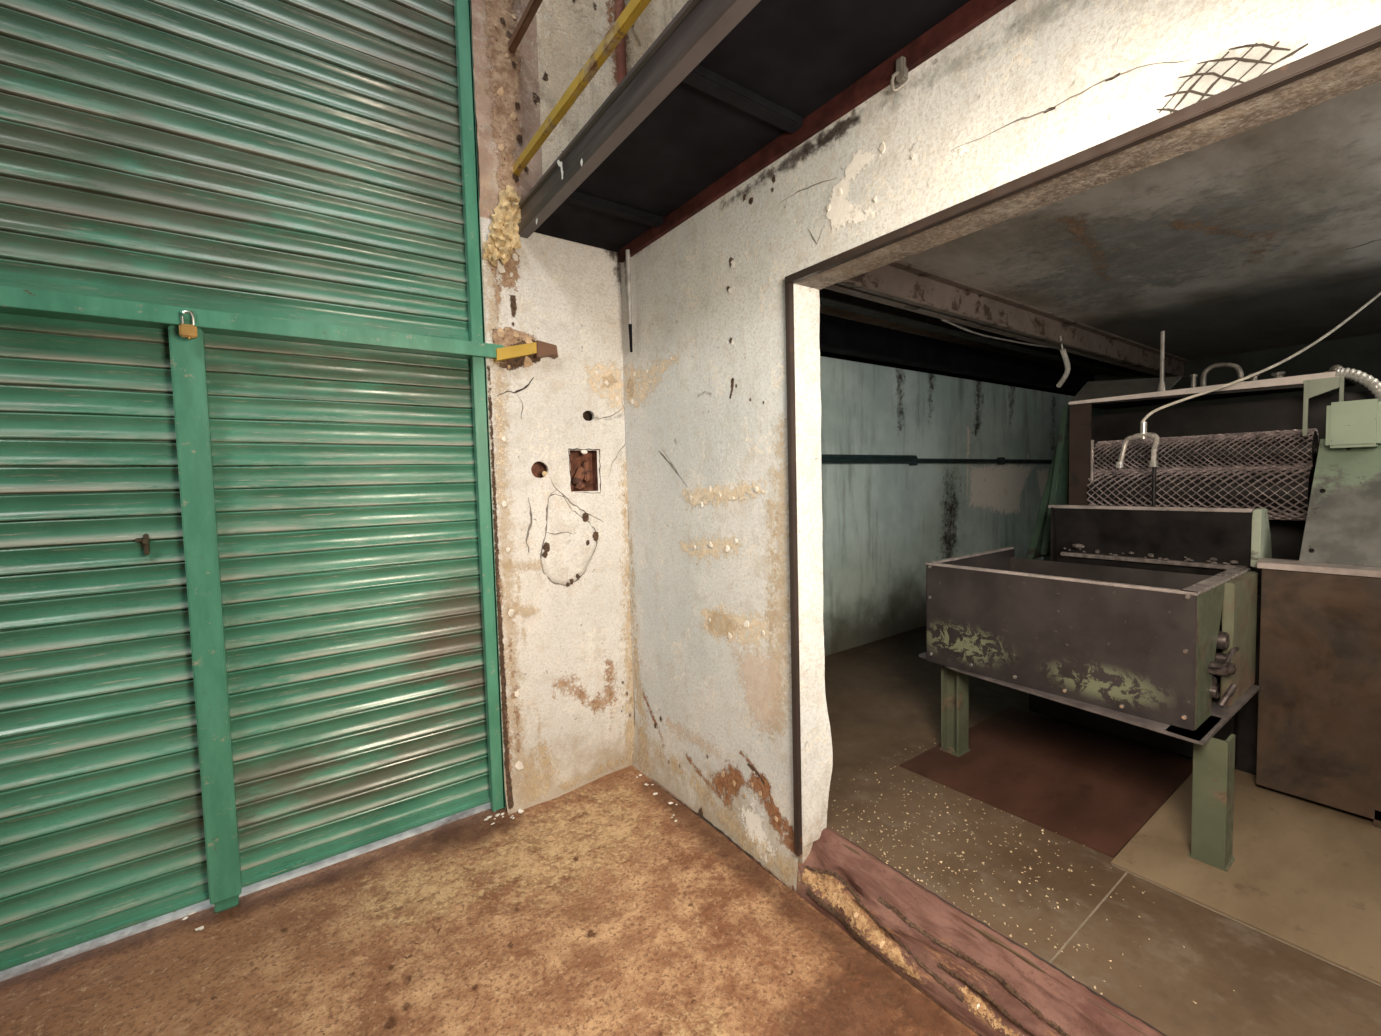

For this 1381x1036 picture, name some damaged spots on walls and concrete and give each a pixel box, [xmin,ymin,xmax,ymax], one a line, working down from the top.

crack [951,60,1189,151]
peeling [824,141,885,232]
water stain [605,249,626,282]
spalling [482,0,612,809]
water stain [524,419,969,1036]
spalling [686,751,1071,1036]
spalling [384,1003,410,1028]